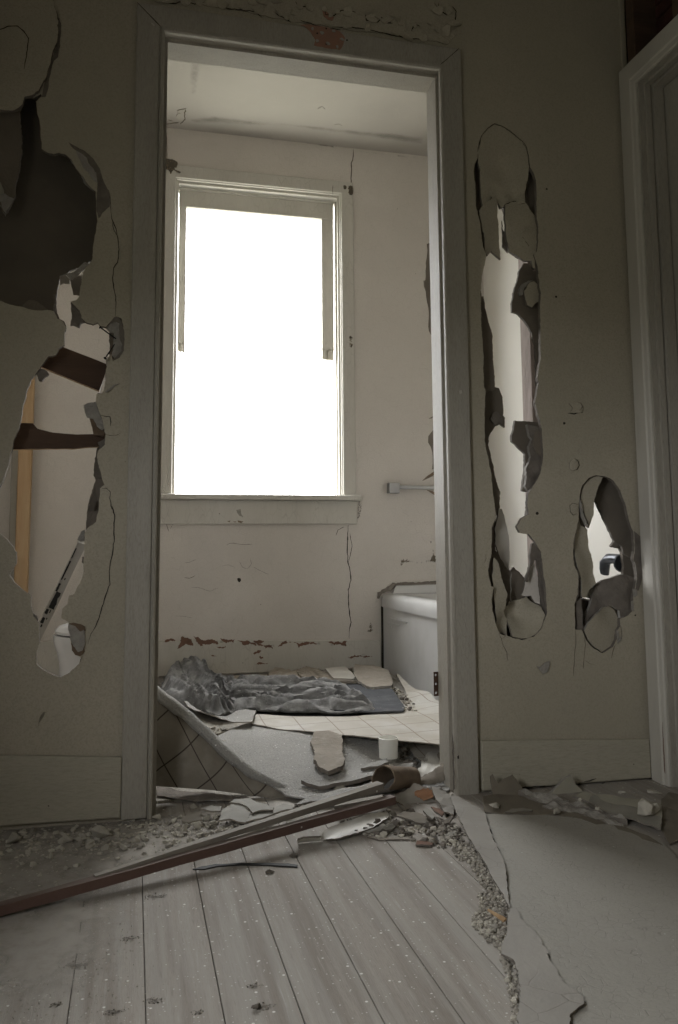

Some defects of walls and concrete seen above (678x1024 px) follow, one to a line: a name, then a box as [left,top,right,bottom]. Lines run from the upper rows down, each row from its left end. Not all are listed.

spalling [0,0,61,216]
spalling [23,262,89,332]
spalling [69,143,111,218]
spalling [474,124,539,386]
spalling [34,384,119,627]
spalling [68,623,86,656]
peeling [165,636,372,665]
crack [336,525,352,631]
spalling [481,296,545,639]
spalling [573,476,642,652]